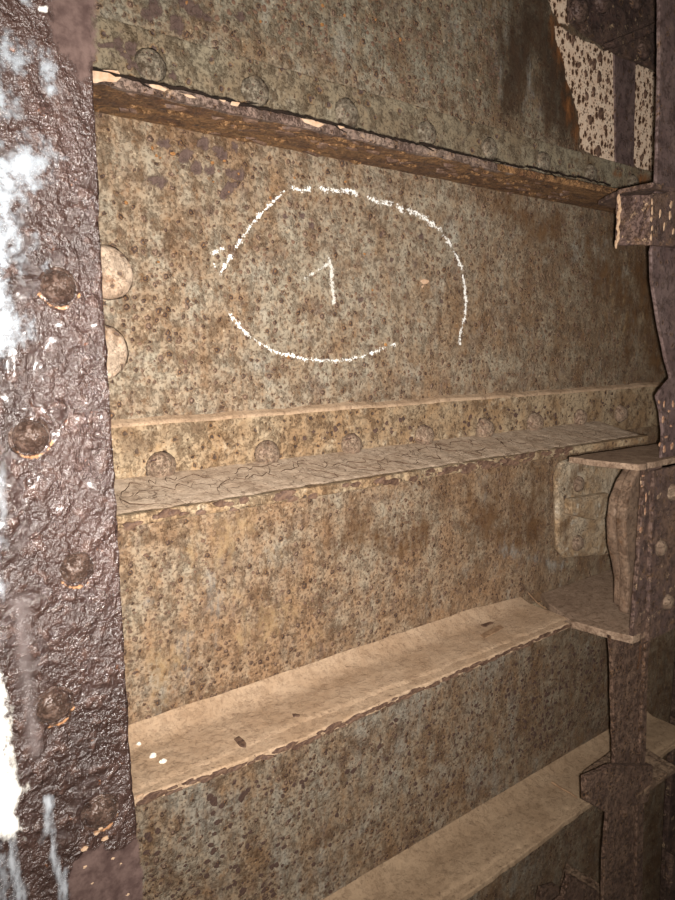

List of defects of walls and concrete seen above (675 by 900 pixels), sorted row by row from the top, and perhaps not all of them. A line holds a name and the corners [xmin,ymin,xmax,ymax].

corrosion [98,37,143,75]
peeling [548,0,615,162]
corrosion [566,31,610,130]
peeling [634,64,656,171]
corrosion [148,136,245,200]
efflorescence [0,150,45,266]
efflorescence [0,282,22,353]
corrosion [658,400,675,453]
crack [119,436,537,506]
water stain [0,674,29,838]
corrosion [67,822,143,900]